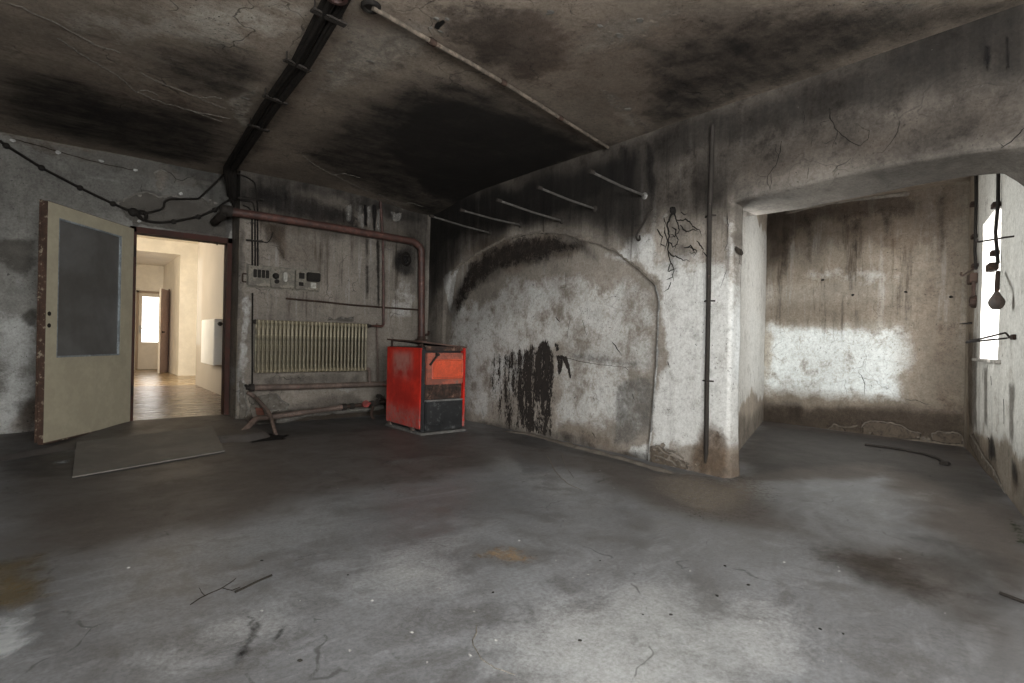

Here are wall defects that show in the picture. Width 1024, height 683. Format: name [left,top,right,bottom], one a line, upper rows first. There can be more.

crack [10,3,230,122]
crack [803,108,900,178]
crack [657,207,740,292]
water stain [767,198,913,266]
flaking render [451,230,700,470]
flaking render [828,421,964,444]